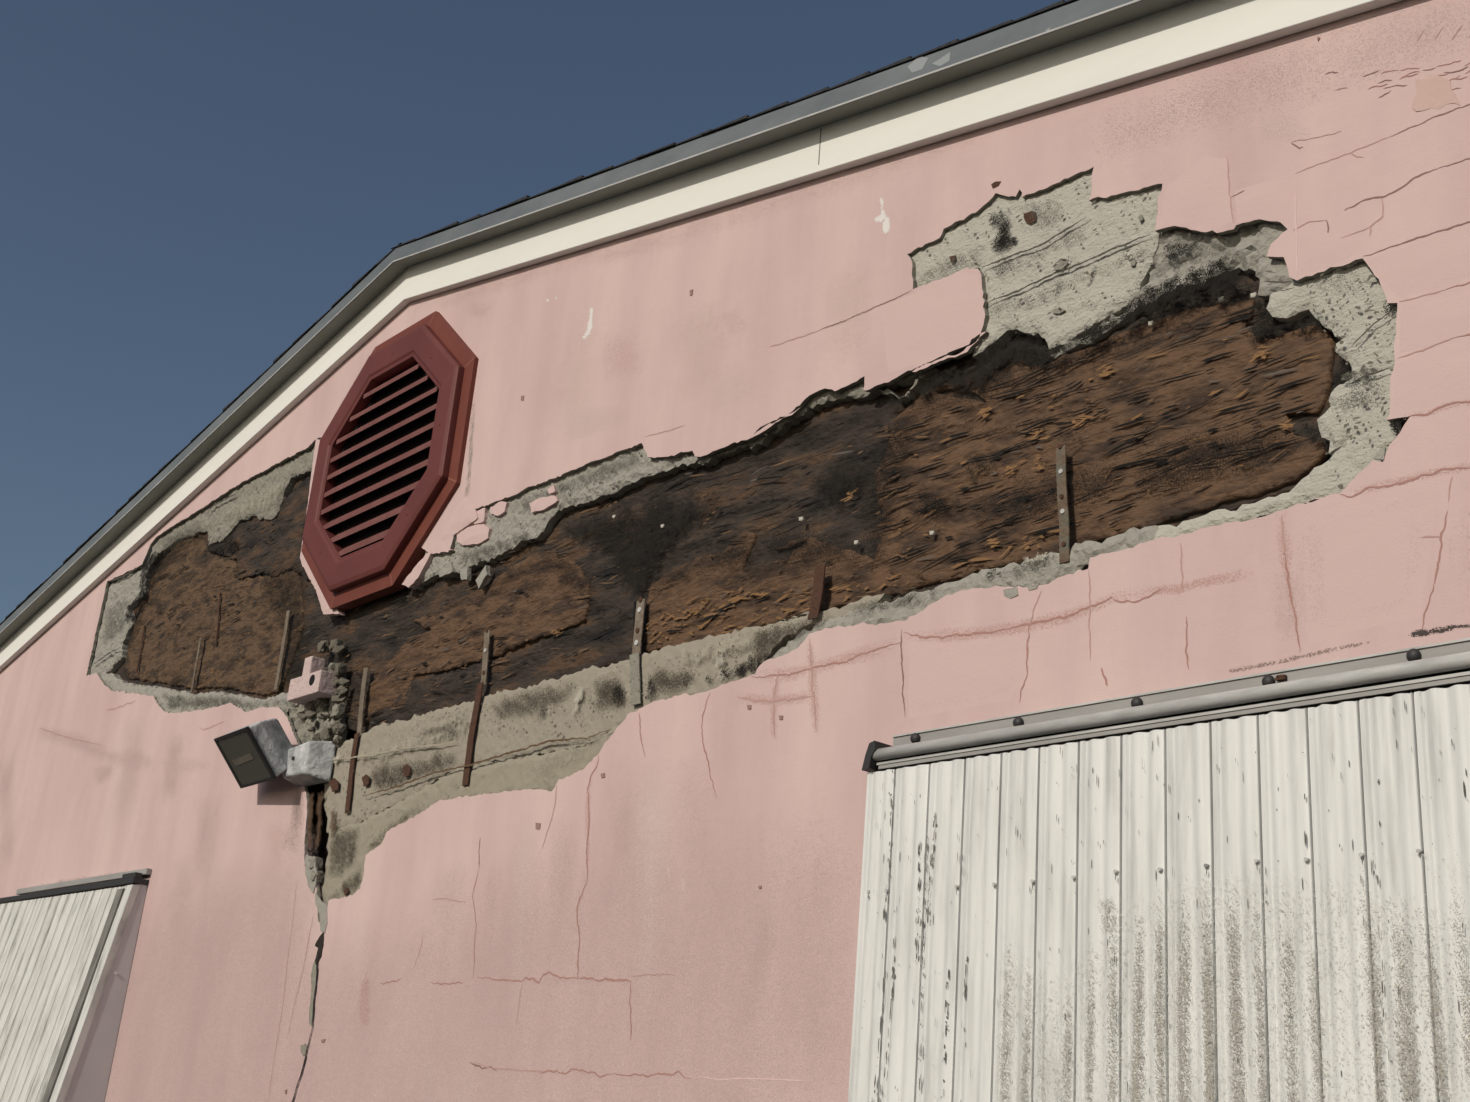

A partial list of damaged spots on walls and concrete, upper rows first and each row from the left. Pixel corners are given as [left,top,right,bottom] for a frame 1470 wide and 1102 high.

crack [1291,60,1470,173]
crack [1294,158,1470,256]
crack [1351,282,1470,381]
spalling [90,171,1407,904]
crack [1281,516,1300,648]
crack [1340,467,1470,628]
water stain [360,706,468,790]
water stain [489,675,627,727]
water stain [646,612,826,699]
crack [701,543,1189,798]
crack [381,754,815,1082]
crack [268,885,328,1102]